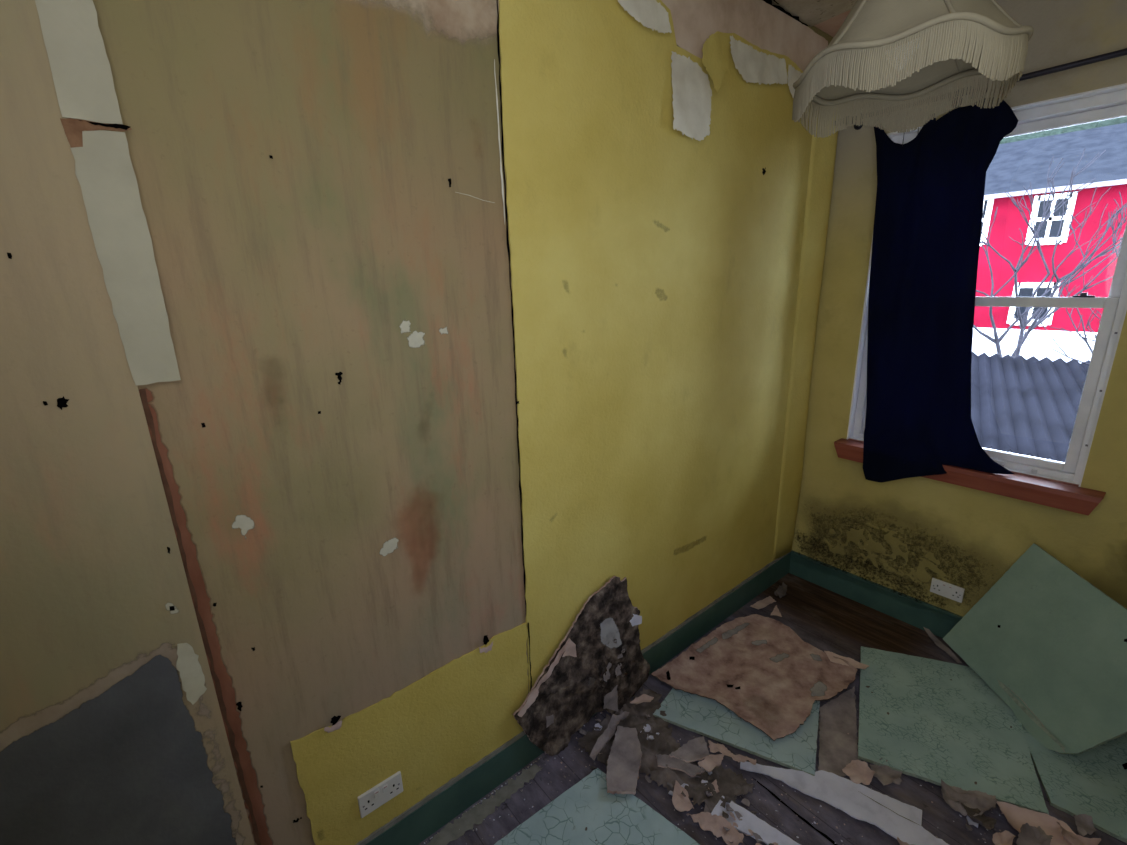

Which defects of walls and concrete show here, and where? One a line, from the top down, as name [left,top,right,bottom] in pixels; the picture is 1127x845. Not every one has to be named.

flaking render [385,0,499,42]
peeling [618,0,828,141]
peeling [399,320,425,348]
mould [797,511,986,607]